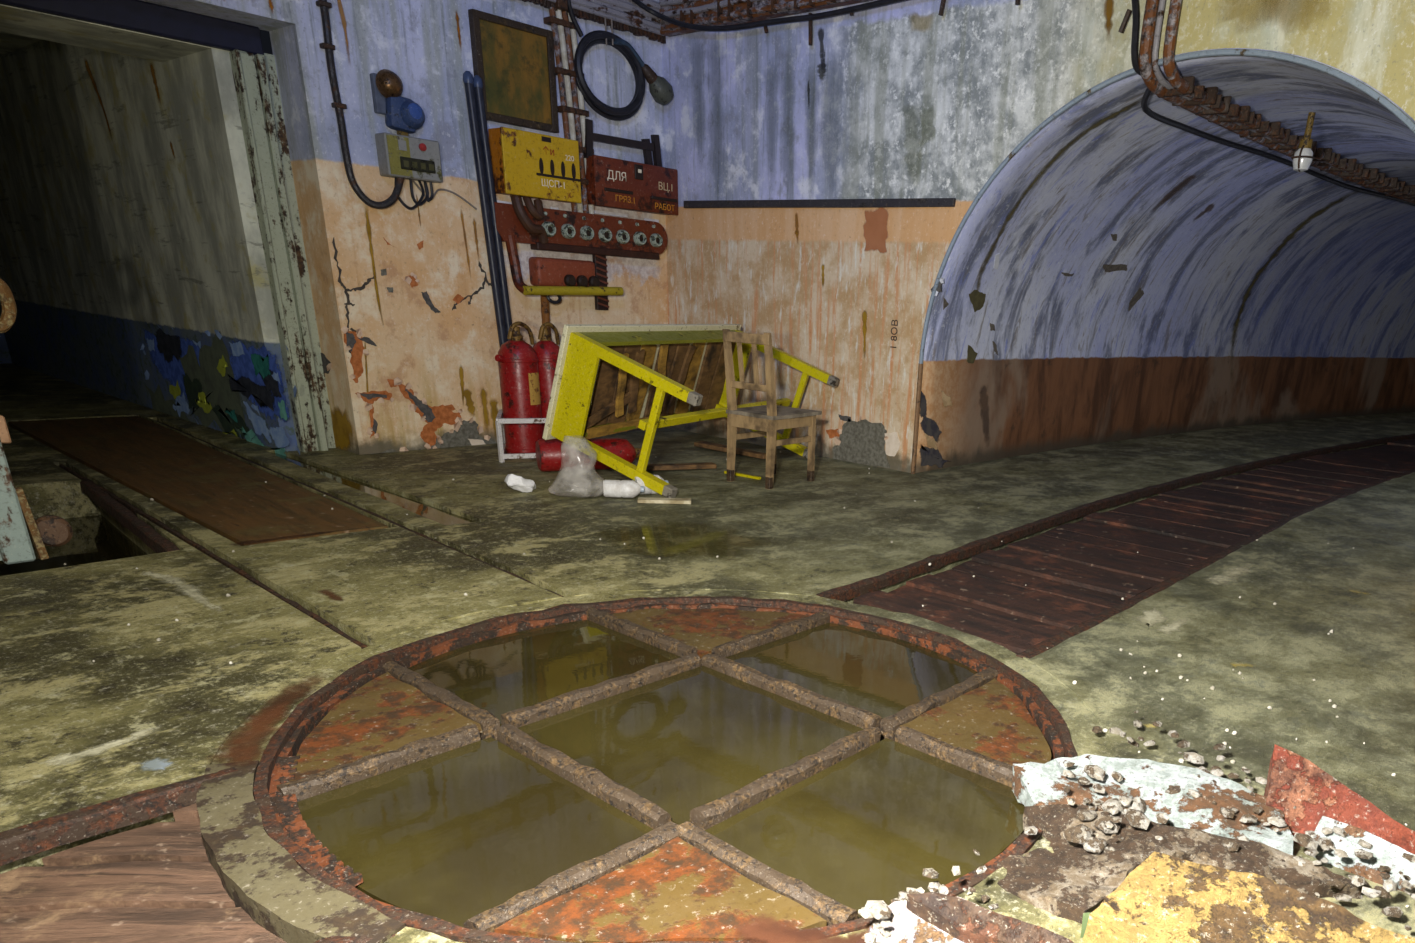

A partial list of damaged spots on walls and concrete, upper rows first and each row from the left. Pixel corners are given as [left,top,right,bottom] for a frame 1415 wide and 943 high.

corrosion [1104,0,1113,33]
damp [807,29,826,104]
crack [332,237,374,353]
crack [452,261,491,310]
flaking render [321,353,332,374]
peeling [341,326,496,454]
flaking render [826,414,901,469]
flaking render [919,391,952,468]